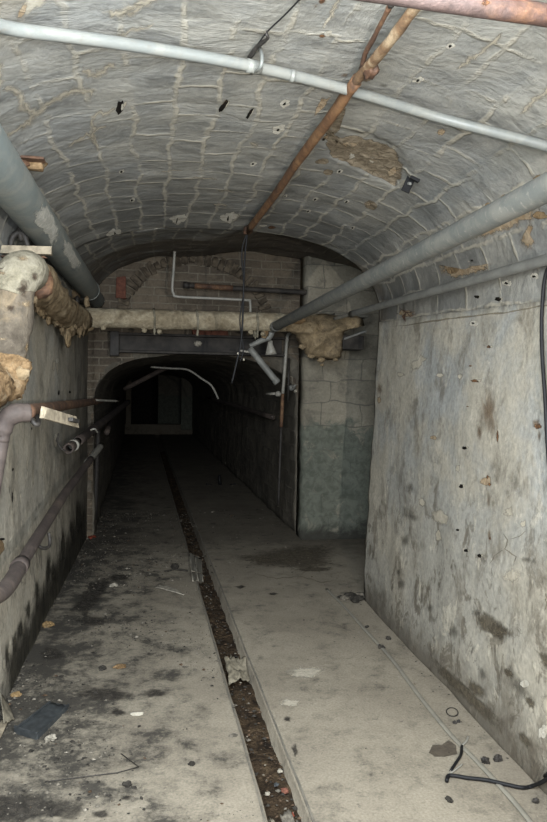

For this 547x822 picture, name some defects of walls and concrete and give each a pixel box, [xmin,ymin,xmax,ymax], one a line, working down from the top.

spalling [315,108,403,186]
damp [6,503,87,691]
damp [72,574,128,625]
damp [78,688,125,700]